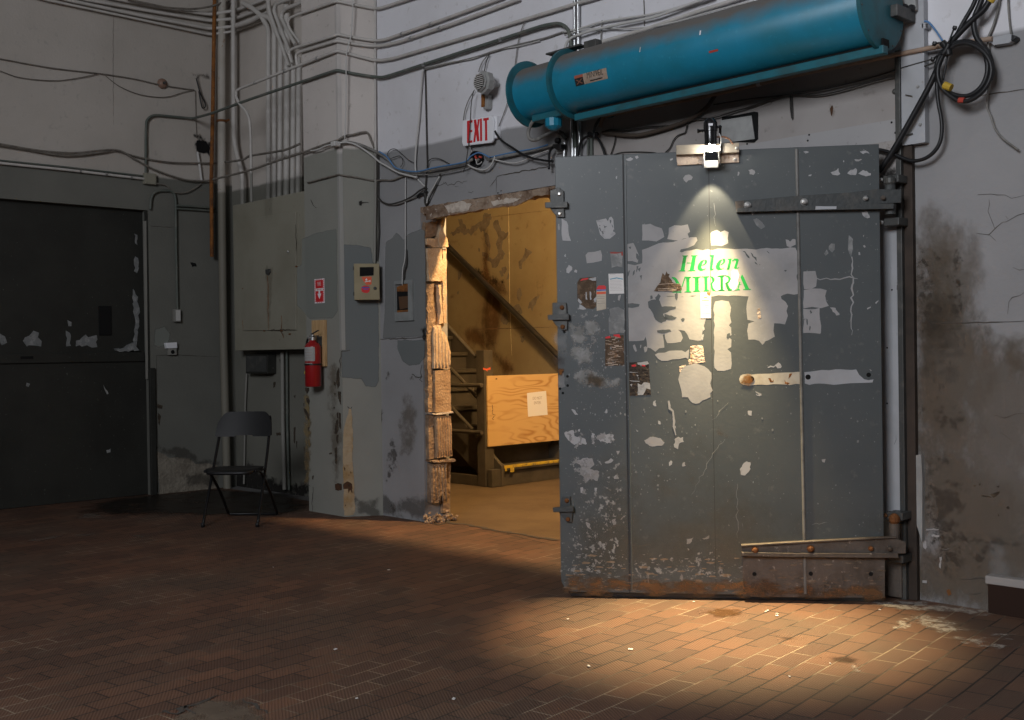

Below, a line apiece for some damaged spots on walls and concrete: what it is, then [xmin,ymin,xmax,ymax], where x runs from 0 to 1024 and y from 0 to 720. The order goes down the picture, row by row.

spalling [420,186,555,280]
crack [977,194,1024,240]
peeling [23,331,42,346]
peeling [66,321,97,348]
peeling [114,289,140,352]
peeling [573,224,840,404]
flaking render [329,368,355,516]
damp [919,228,1024,610]
peeling [560,409,731,582]
rust [566,577,883,600]